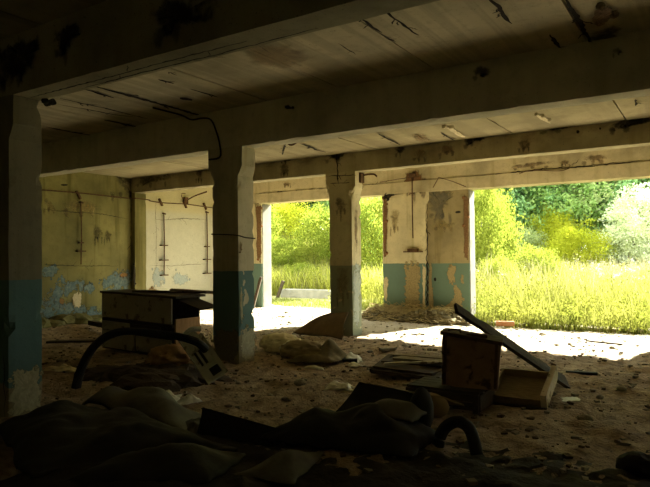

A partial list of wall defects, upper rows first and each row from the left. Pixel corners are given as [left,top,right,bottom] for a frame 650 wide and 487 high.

crack [359,13,418,42]
crack [489,0,512,24]
crack [565,0,593,42]
crack [498,159,650,174]
peeling [40,263,137,318]
peeling [403,260,436,310]
peeling [445,264,464,312]
peeling [214,287,257,362]
peeling [7,364,44,417]